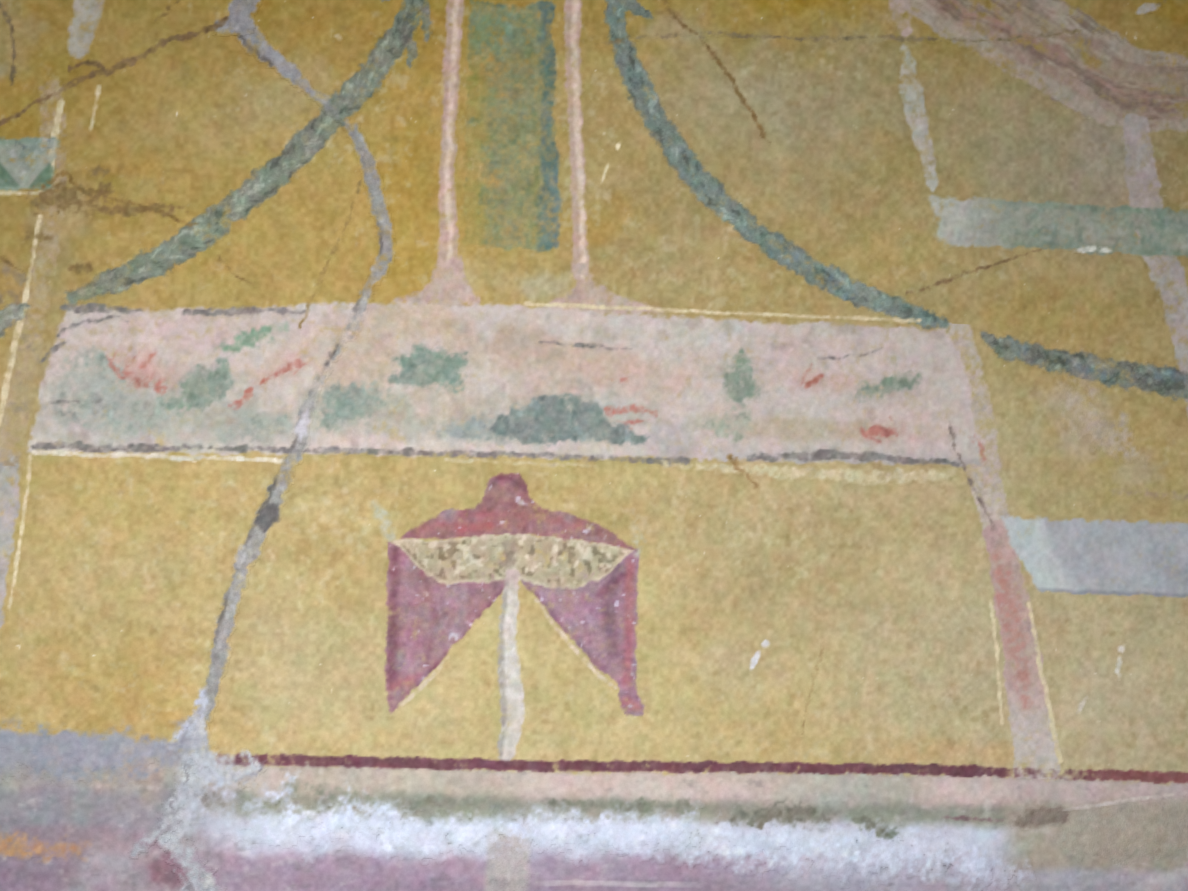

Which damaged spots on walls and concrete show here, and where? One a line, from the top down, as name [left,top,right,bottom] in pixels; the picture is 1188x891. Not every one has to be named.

crack [594,0,1083,146]
crack [0,0,397,891]
water stain [173,748,1037,891]